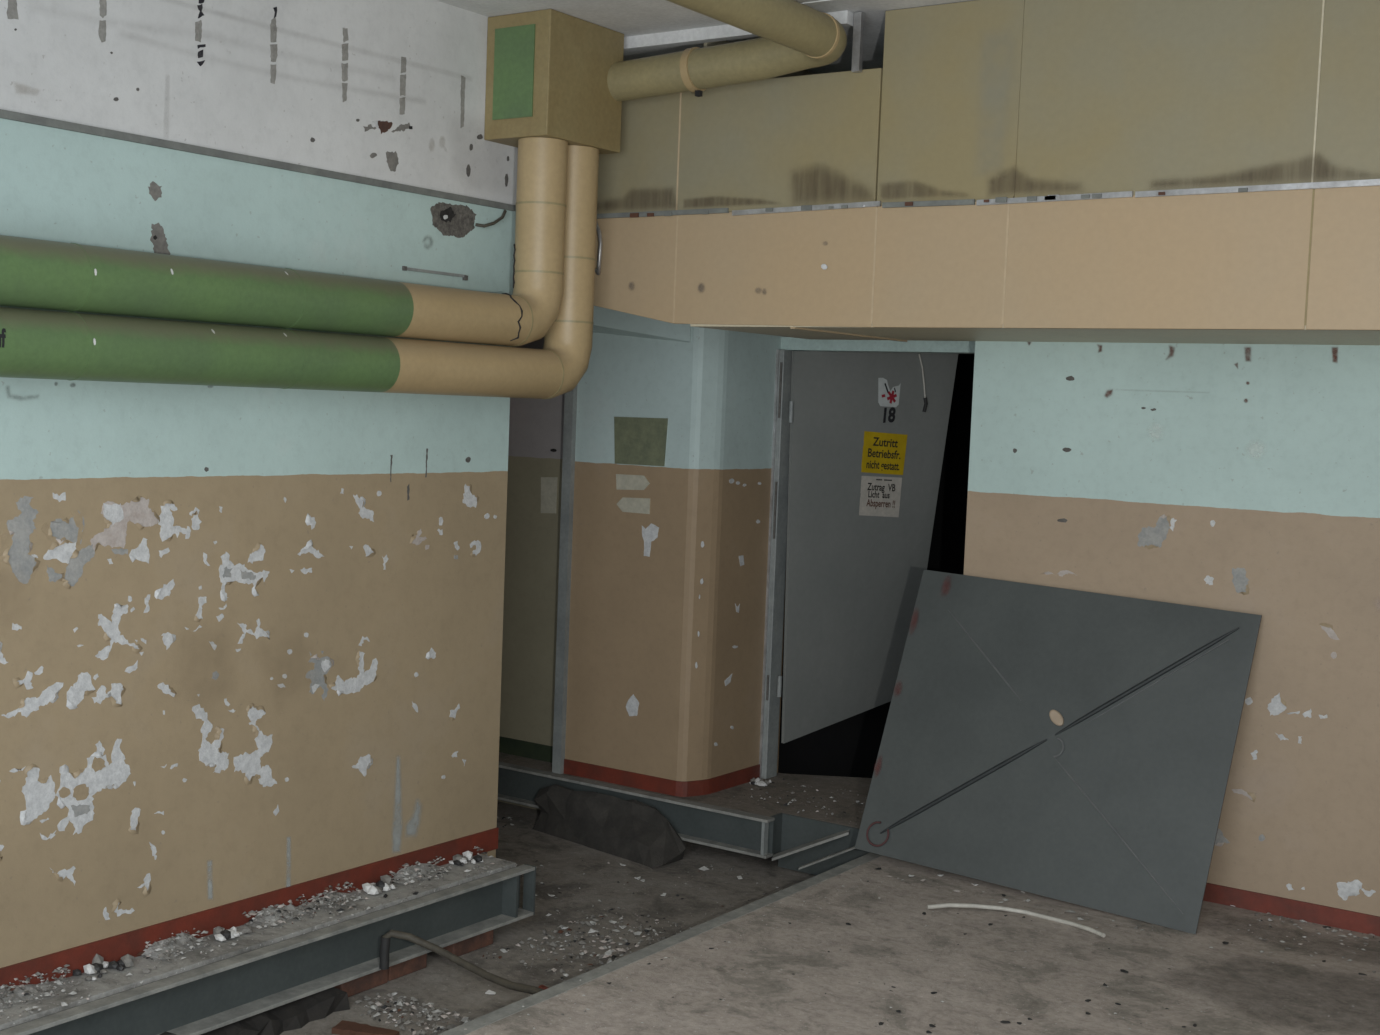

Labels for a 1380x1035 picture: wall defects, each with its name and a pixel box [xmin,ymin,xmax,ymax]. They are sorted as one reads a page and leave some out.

flaking render [430,202,477,238]
peeling [341,488,382,522]
peeling [0,492,202,589]
peeling [290,514,323,574]
peeling [642,523,659,557]
peeling [0,541,270,718]
peeling [304,633,378,701]
peeling [1245,692,1327,719]
peeling [192,694,289,787]
peeling [0,739,136,840]
peeling [103,808,165,920]
peeling [1337,880,1376,901]